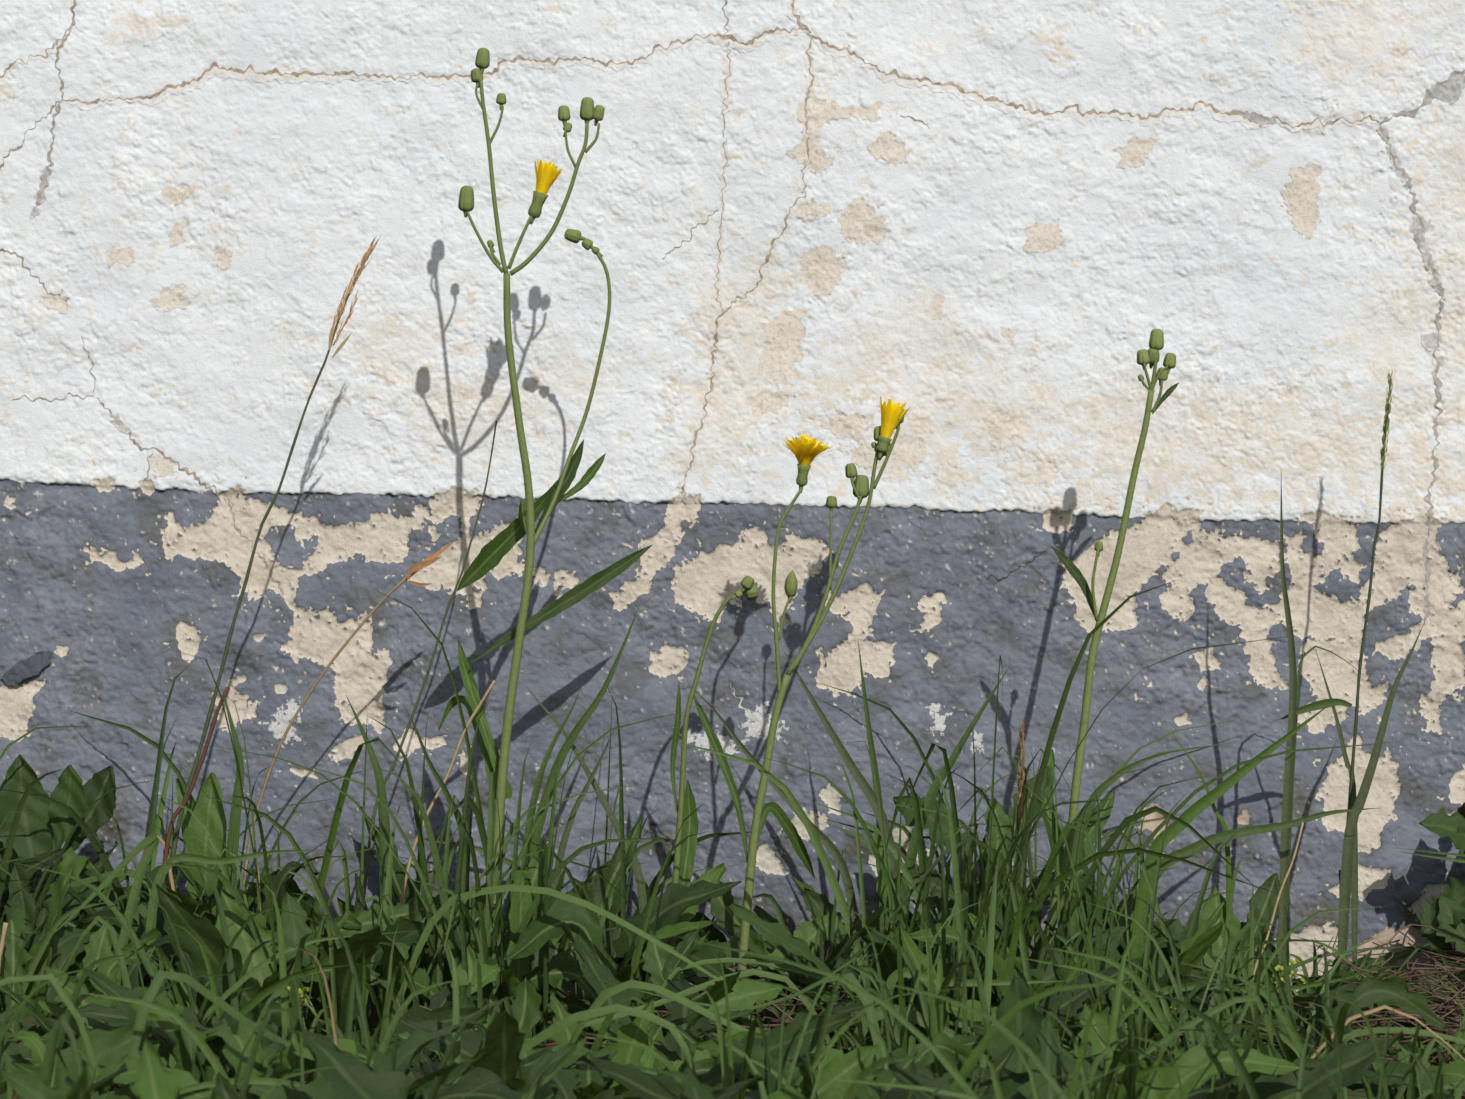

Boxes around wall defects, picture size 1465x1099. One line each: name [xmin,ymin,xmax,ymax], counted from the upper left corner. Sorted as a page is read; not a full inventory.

crack [0,0,1465,625]
peeling [0,646,69,753]
peeling [279,763,320,787]
peeling [80,453,579,783]
peeling [601,483,952,706]
peeling [1030,497,1465,901]
peeling [1274,871,1456,992]